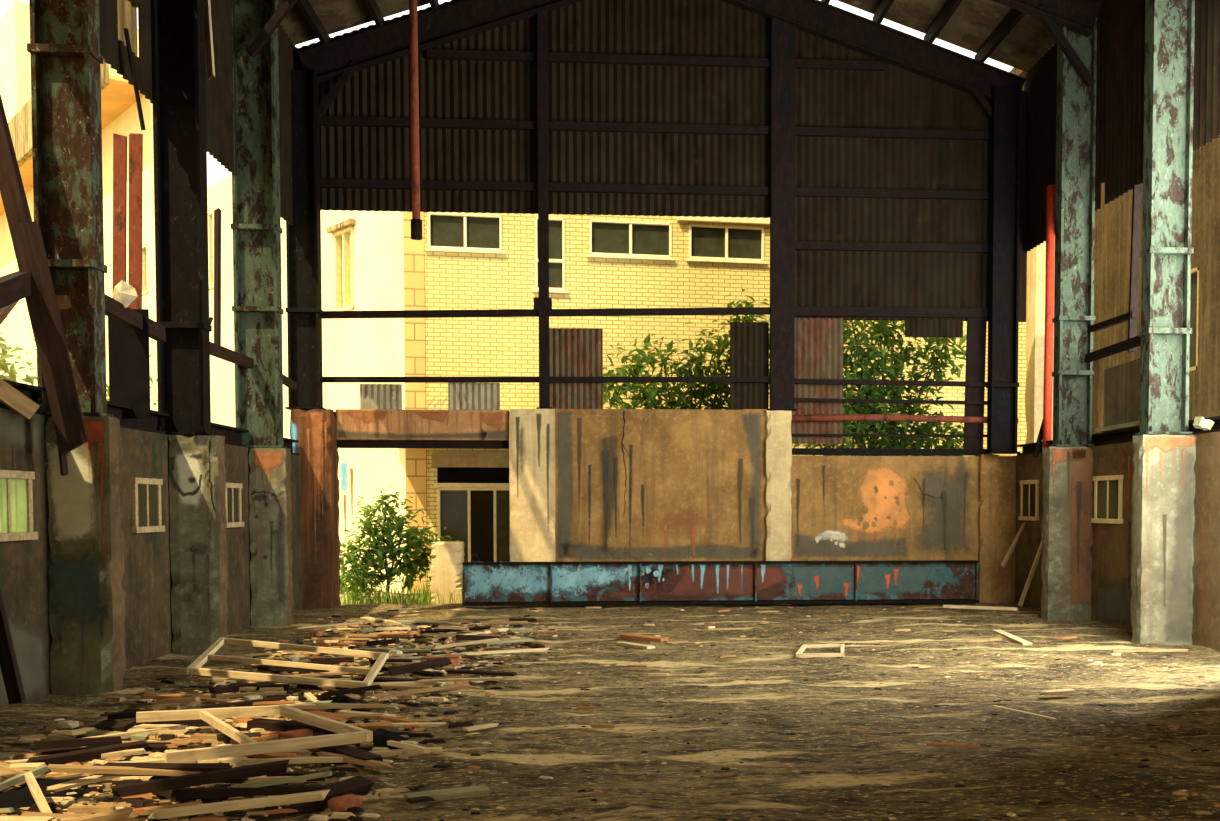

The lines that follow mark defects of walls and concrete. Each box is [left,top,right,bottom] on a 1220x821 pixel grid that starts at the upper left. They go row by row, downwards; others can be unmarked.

flaking render [47,443,95,540]
damp [337,412,760,559]
peeling [815,467,912,548]
peeling [466,564,674,599]